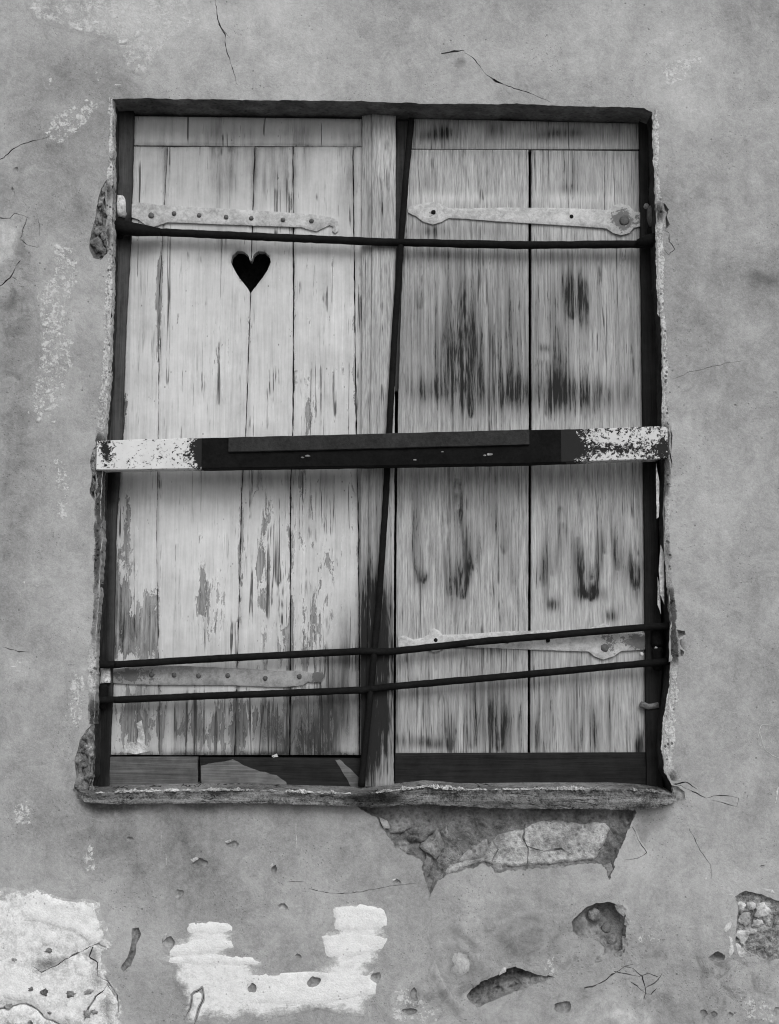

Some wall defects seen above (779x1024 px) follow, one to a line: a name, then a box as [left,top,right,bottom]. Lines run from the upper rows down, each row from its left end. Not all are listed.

crack [215,3,236,80]
crack [441,50,548,101]
crack [675,782,739,807]
spalling [359,804,636,898]
peeling [0,890,118,1024]
spalling [572,902,638,963]
crack [584,964,662,998]
spalling [724,888,779,961]